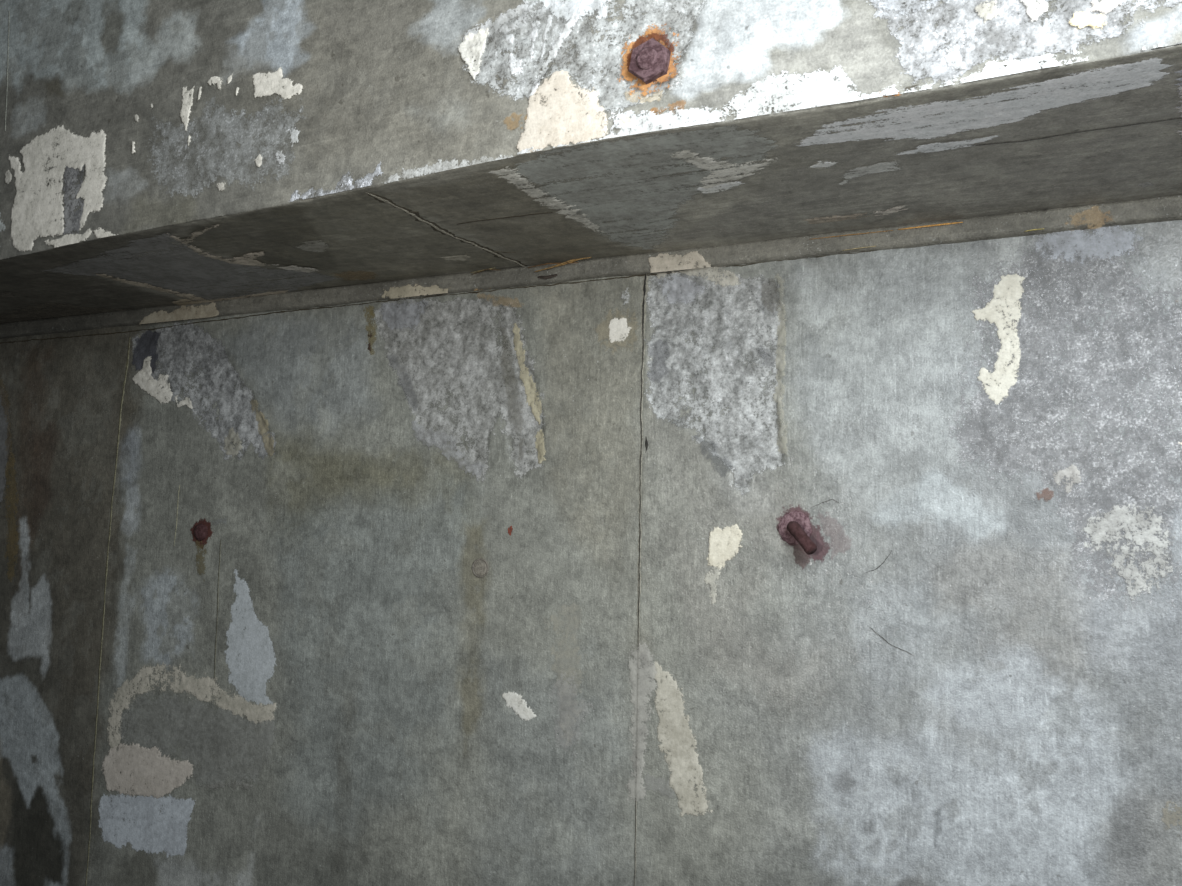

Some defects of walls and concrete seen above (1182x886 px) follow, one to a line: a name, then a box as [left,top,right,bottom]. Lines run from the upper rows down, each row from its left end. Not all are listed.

spalling [458,0,707,113]
rust [617,24,681,99]
spalling [869,0,1182,84]
flaking render [45,228,115,248]
crack [366,192,553,267]
flaking render [608,317,632,343]
spalling [368,296,546,482]
spalling [644,267,786,496]
rust [190,519,212,549]
rust [777,505,830,570]